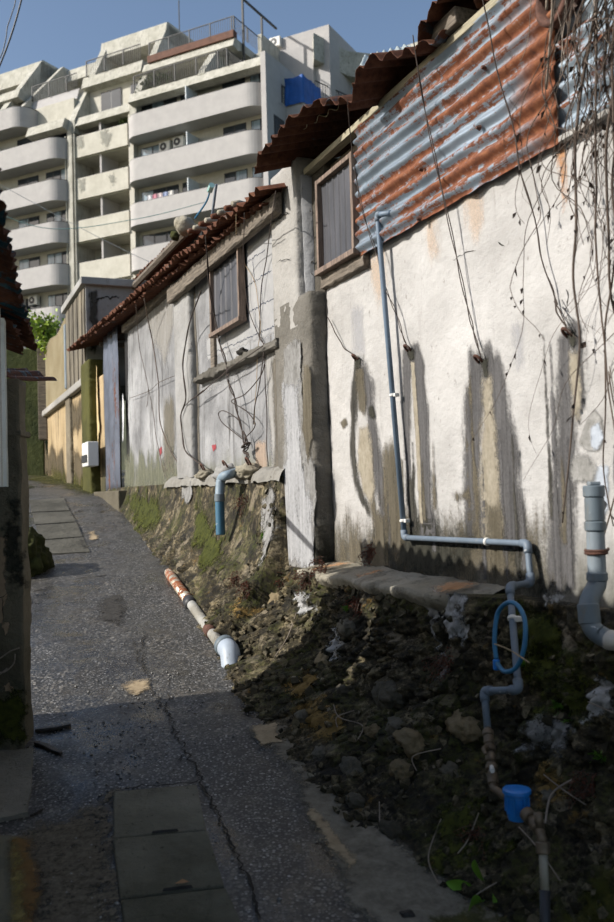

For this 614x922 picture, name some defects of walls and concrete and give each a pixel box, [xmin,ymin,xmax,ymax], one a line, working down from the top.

peeling [0,537,10,636]
peeling [258,337,316,568]
damp [316,320,585,607]
crack [123,631,261,918]